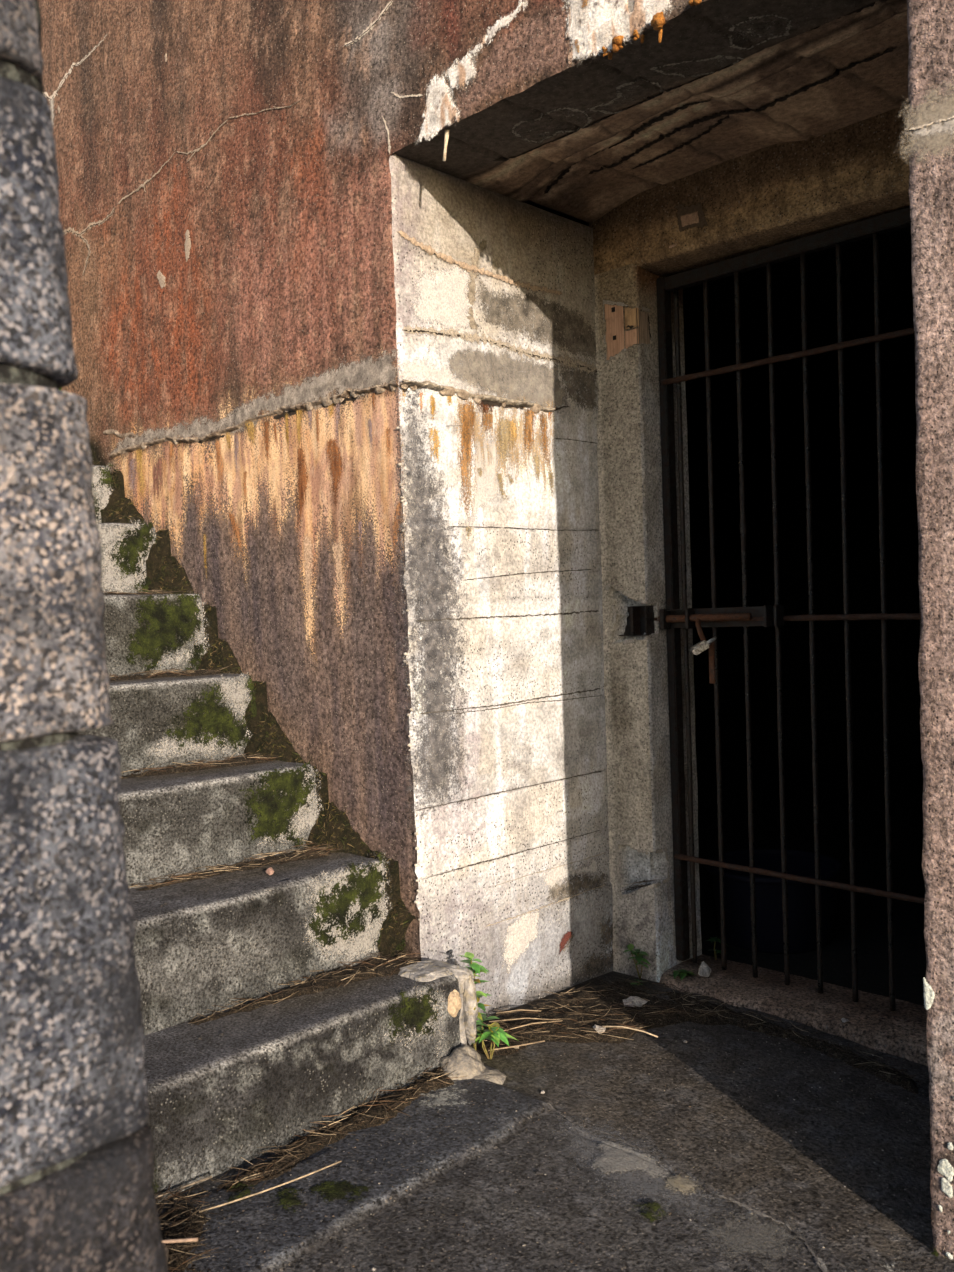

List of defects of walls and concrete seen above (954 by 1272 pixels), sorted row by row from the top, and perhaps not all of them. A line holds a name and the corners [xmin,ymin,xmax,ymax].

crack [44,32,109,125]
crack [344,0,394,46]
damp [417,0,528,142]
rust [602,12,665,57]
crack [492,47,897,195]
crack [63,98,303,278]
rust [111,351,556,662]
damp [396,266,599,816]
damp [157,592,209,668]
damp [147,672,252,761]
damp [257,766,324,847]